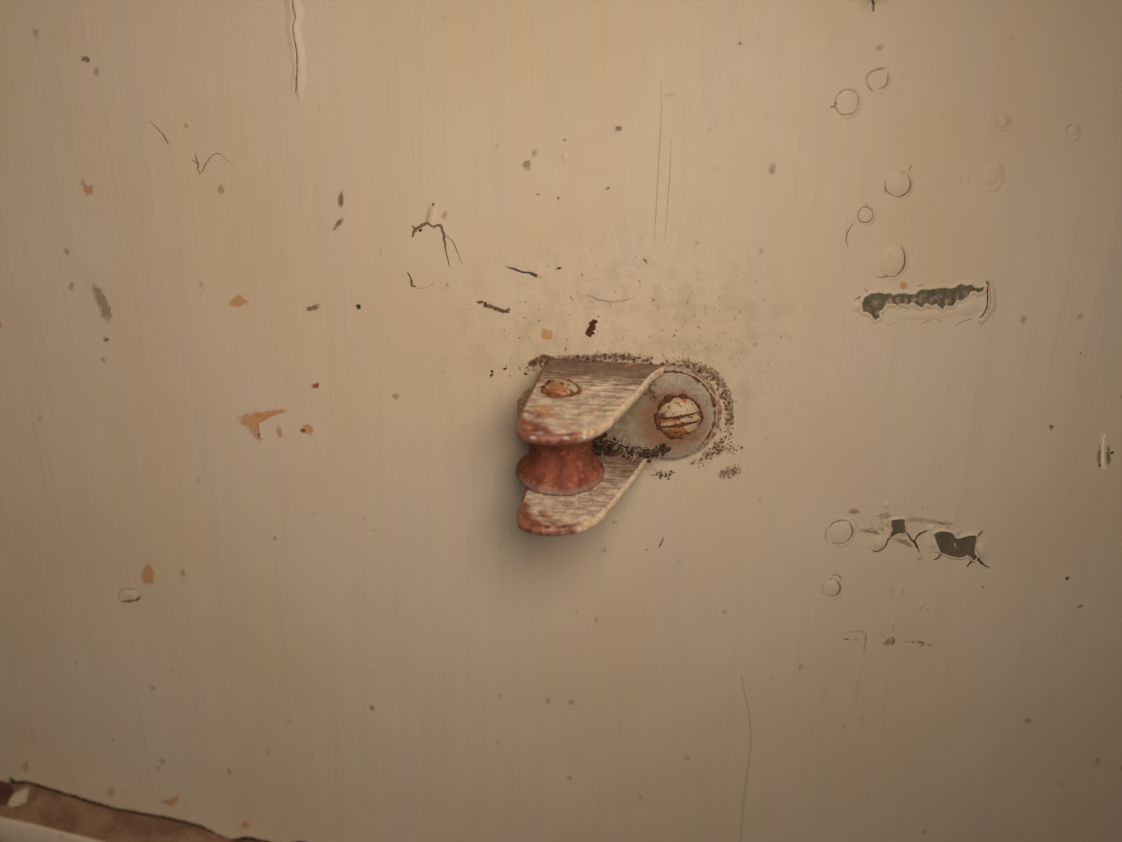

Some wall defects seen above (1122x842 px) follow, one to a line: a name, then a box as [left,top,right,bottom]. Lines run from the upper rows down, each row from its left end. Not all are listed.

crack [849,0,890,11]
peeling [851,275,998,327]
rust [541,379,582,398]
rust [654,393,704,439]
peeling [868,501,992,568]
peeling [0,781,37,809]